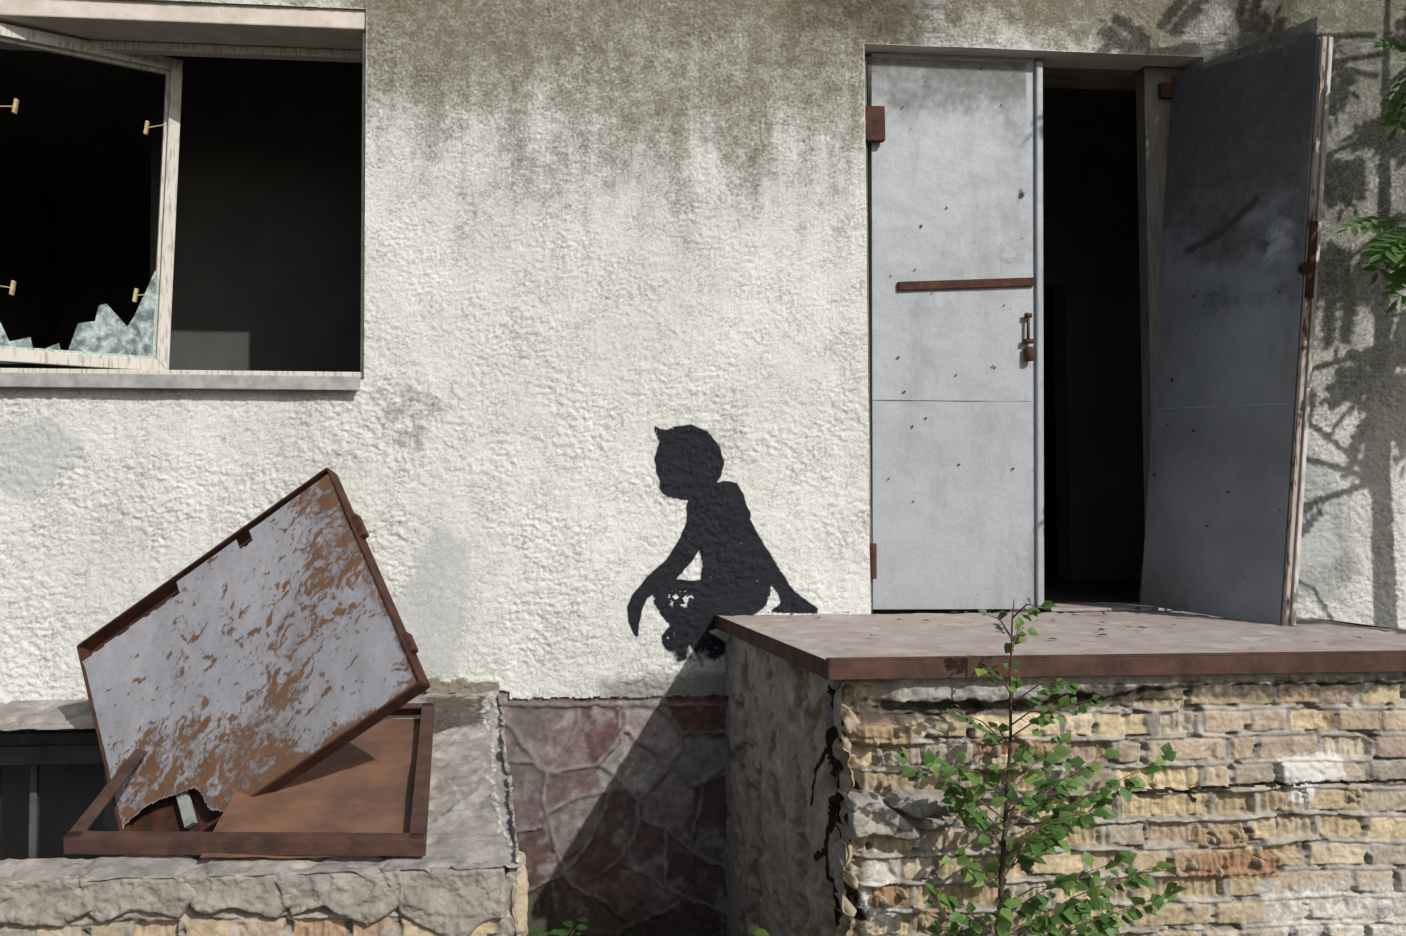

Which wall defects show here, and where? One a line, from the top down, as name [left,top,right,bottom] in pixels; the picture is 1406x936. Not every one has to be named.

leakage [347,0,1406,399]
rust [106,474,418,824]
spalling [851,724,914,749]
leakage [1272,749,1346,805]
spalling [836,788,956,841]
spalling [0,851,529,936]
spalling [870,884,952,930]